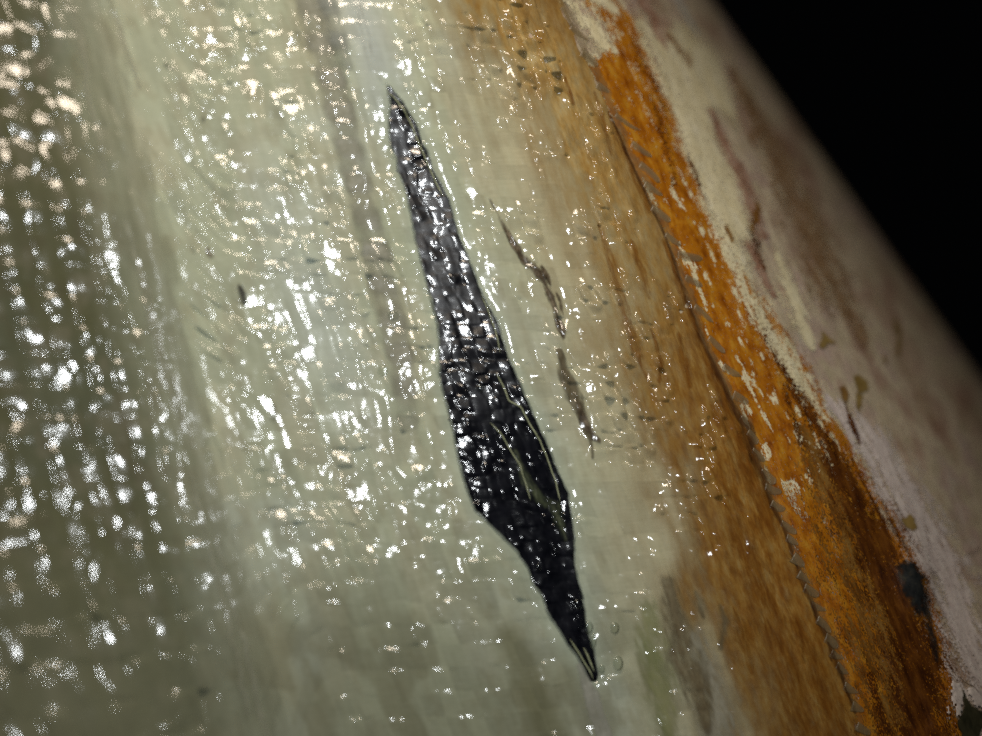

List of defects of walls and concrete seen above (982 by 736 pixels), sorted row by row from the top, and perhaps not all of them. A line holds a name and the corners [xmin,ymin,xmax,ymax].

crack [490,201,601,458]
rust [455,0,977,736]
peeling [947,681,982,736]